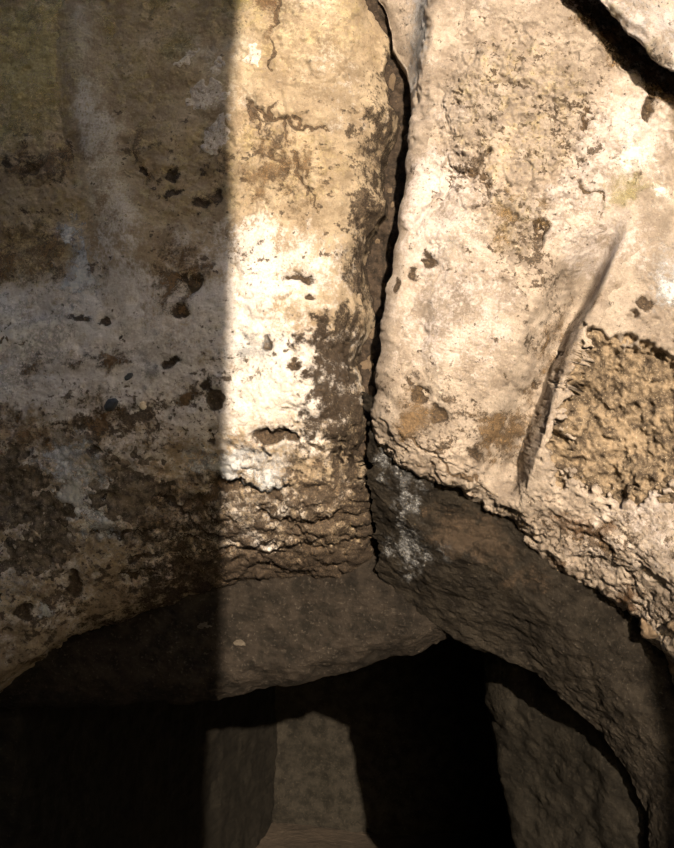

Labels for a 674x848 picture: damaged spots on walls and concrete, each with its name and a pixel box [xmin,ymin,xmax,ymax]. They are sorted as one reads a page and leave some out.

crack [267,0,282,72]
damp [469,312,582,463]
spalling [545,328,674,507]